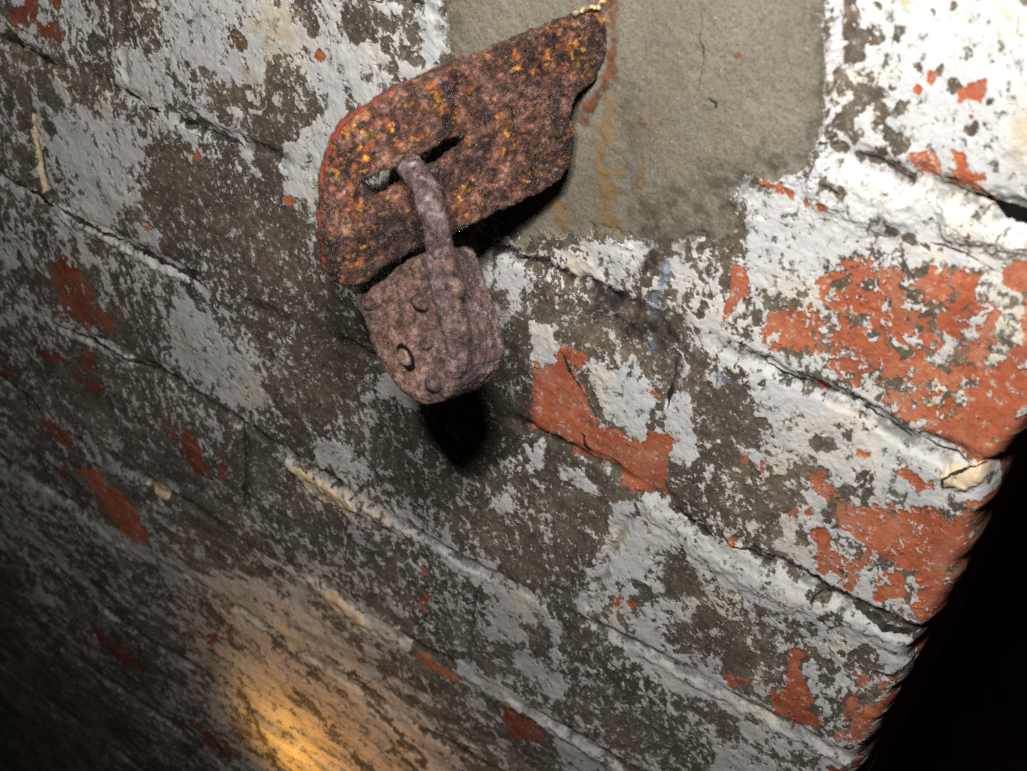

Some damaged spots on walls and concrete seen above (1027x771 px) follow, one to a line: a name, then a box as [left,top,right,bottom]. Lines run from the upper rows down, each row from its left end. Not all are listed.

peeling [91,0,171,84]
peeling [227,16,247,65]
peeling [339,0,446,78]
rust [578,0,617,126]
flaking render [755,180,826,212]
crack [860,151,915,182]
crack [941,180,1027,223]
peeling [0,48,597,595]
flaking render [524,257,1027,625]
crack [766,360,993,489]
crack [674,505,772,560]
peeling [0,559,235,771]